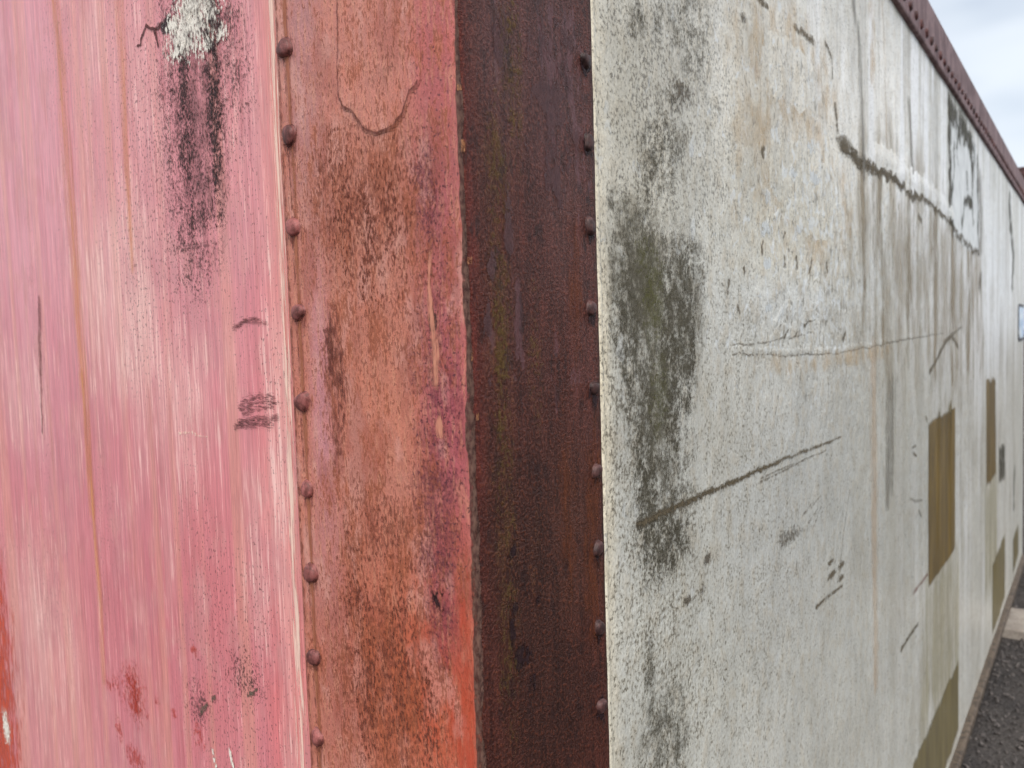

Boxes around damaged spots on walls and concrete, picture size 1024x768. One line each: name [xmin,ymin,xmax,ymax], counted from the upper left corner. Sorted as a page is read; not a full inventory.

peeling [165,0,227,65]
crack [336,0,421,136]
leakage [156,0,254,303]
rust [275,0,447,768]
leakage [665,297,695,444]
crack [731,333,939,358]
leakage [635,404,689,578]